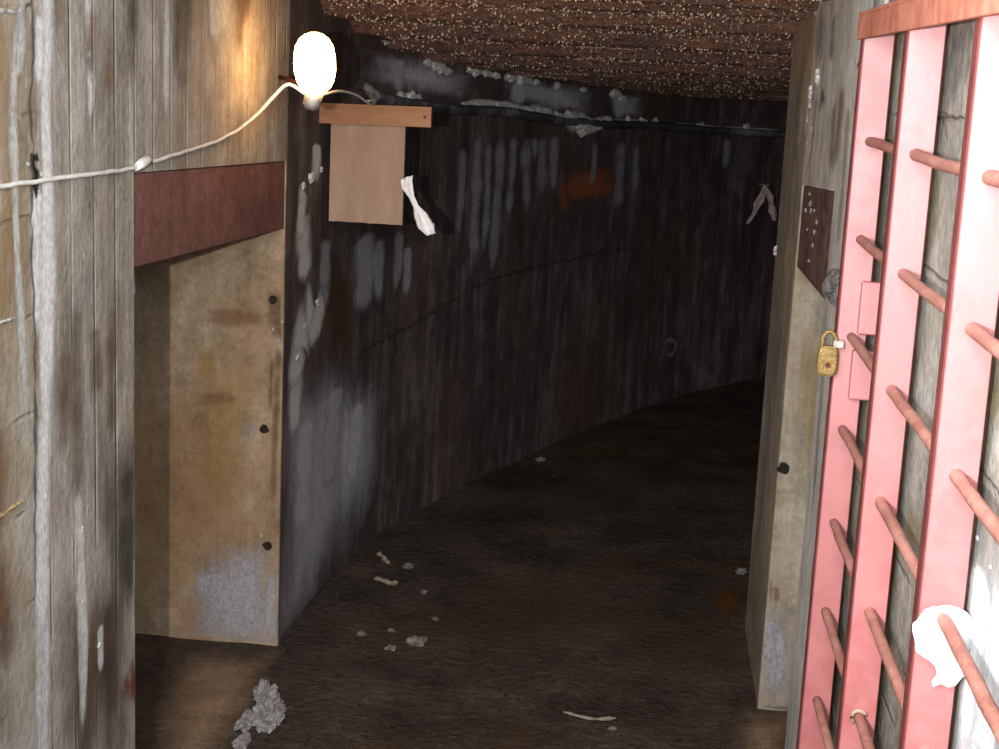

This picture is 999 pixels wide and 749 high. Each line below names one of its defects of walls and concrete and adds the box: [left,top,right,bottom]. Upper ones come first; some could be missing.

damp [457,138,558,262]
damp [614,146,638,204]
damp [356,233,411,307]
damp [289,144,371,602]
damp [198,557,275,639]